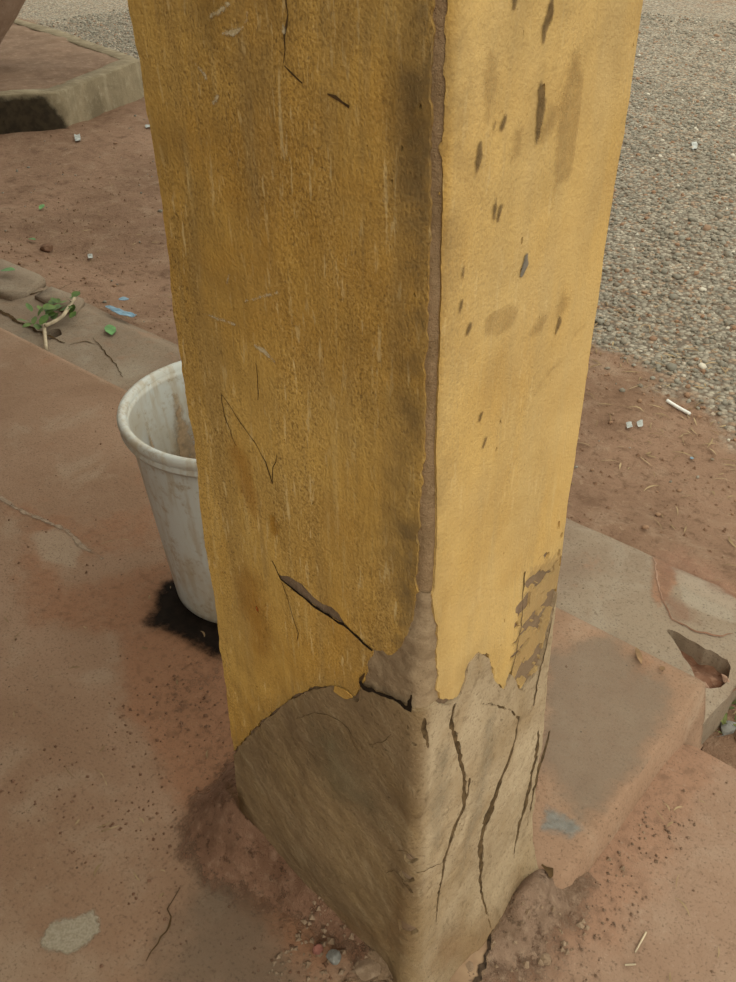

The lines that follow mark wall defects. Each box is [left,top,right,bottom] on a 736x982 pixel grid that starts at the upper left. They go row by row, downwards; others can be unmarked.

crack [283,0,302,83]
crack [327,93,349,108]
crack [272,561,373,651]
spalling [359,590,438,712]
crack [511,572,526,675]
crack [387,622,553,982]